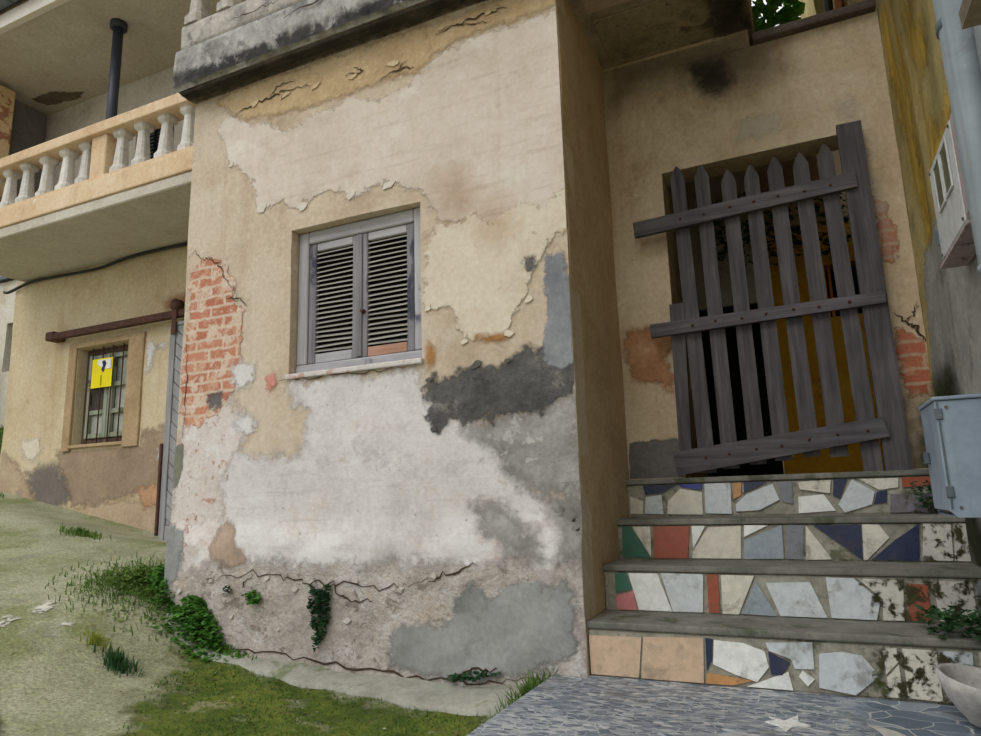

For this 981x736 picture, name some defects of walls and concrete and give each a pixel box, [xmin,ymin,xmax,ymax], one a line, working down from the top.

flaking render [217,0,566,344]
peeling [164,258,587,687]